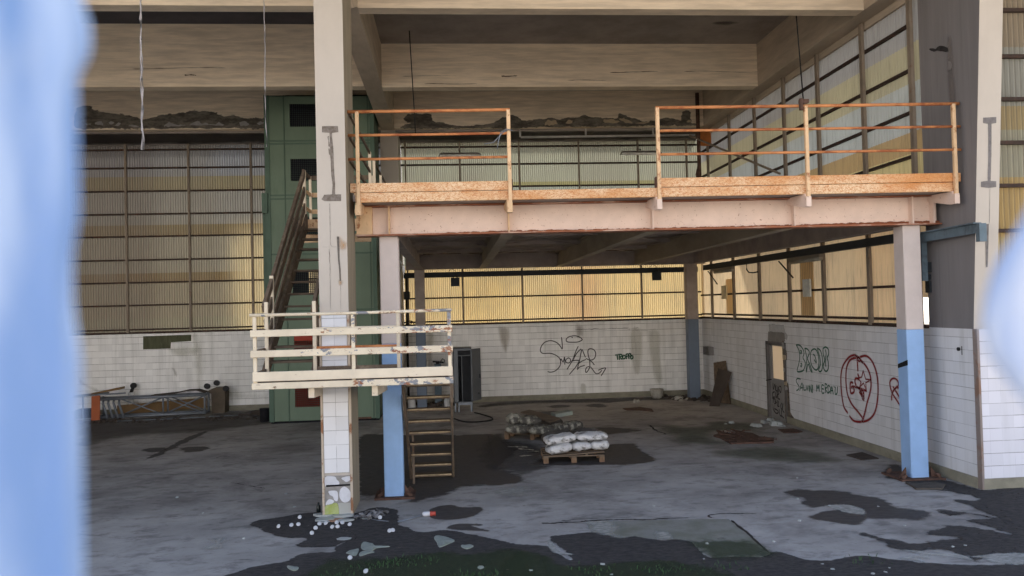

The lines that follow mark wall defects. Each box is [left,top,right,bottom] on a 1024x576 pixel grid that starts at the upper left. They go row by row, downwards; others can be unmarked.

peeling [77,106,264,130]
peeling [400,110,696,129]
peeling [143,335,191,349]
peeling [324,475,351,514]